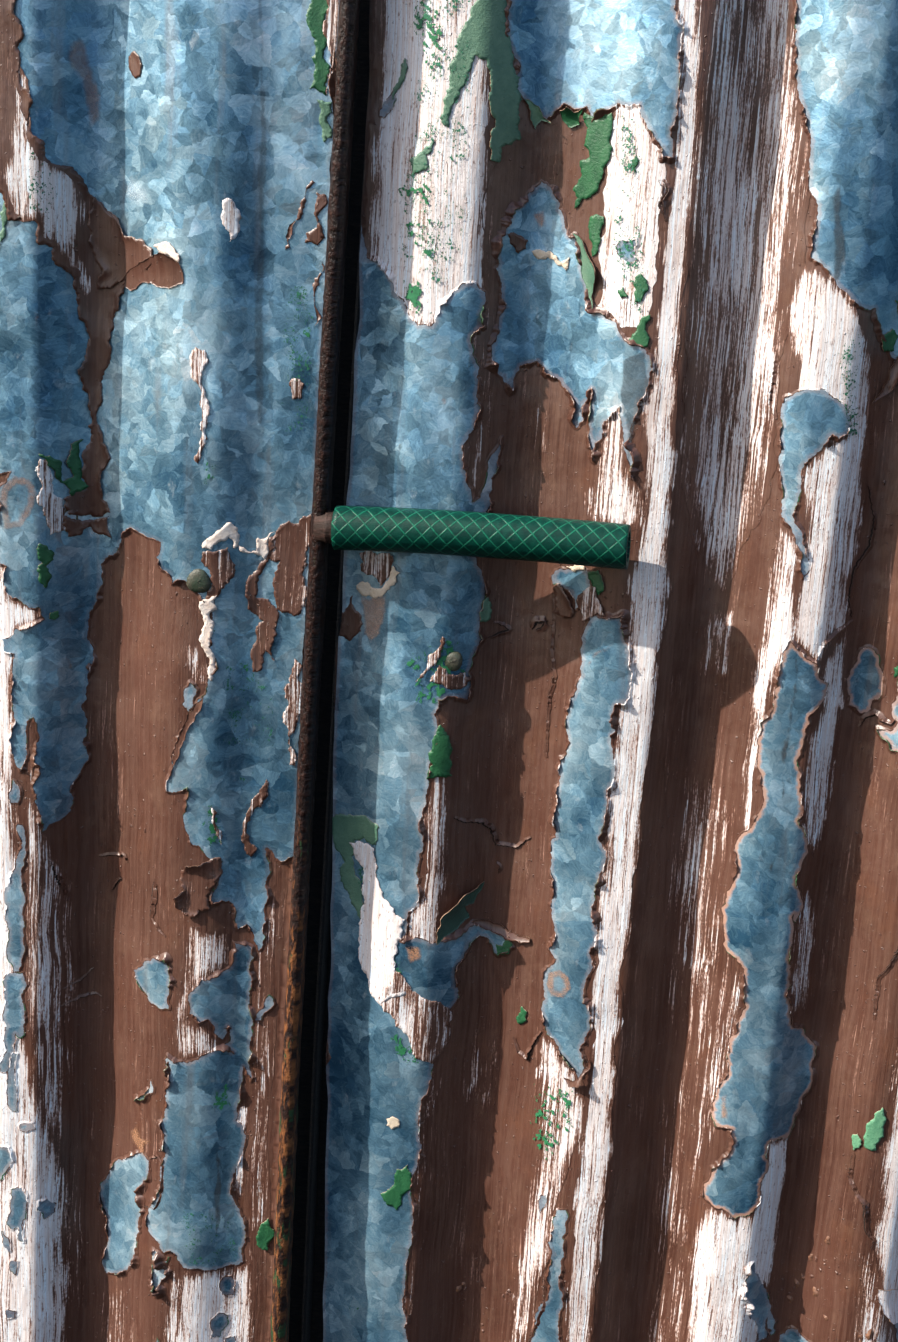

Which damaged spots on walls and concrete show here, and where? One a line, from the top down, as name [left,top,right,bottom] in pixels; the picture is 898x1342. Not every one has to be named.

peeling [0,0,340,1342]
peeling [323,0,898,1342]